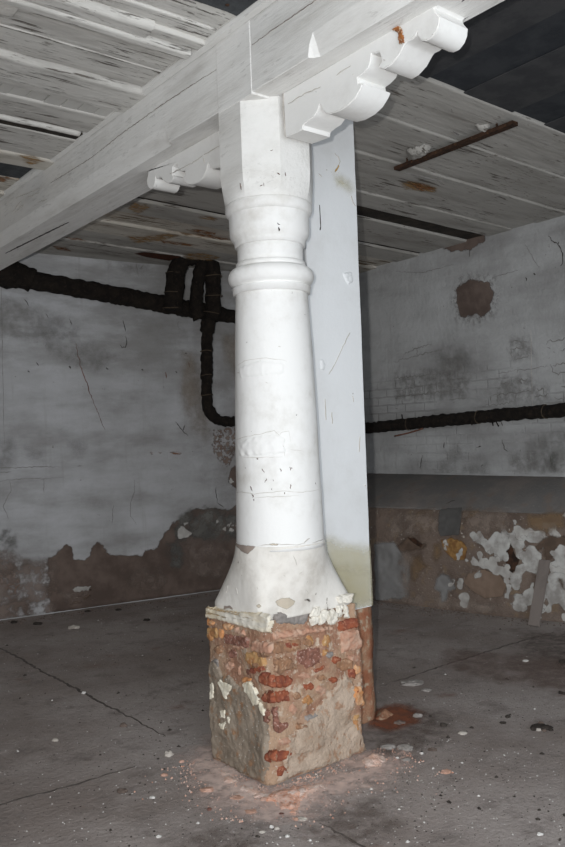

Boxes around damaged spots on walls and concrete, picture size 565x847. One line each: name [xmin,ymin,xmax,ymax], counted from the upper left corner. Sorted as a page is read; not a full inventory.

crack [252,0,316,45]
crack [282,87,320,137]
flaking render [456,279,494,318]
crack [76,344,105,429]
peeling [212,428,236,488]
flaking render [47,505,254,612]
peeling [435,520,565,621]